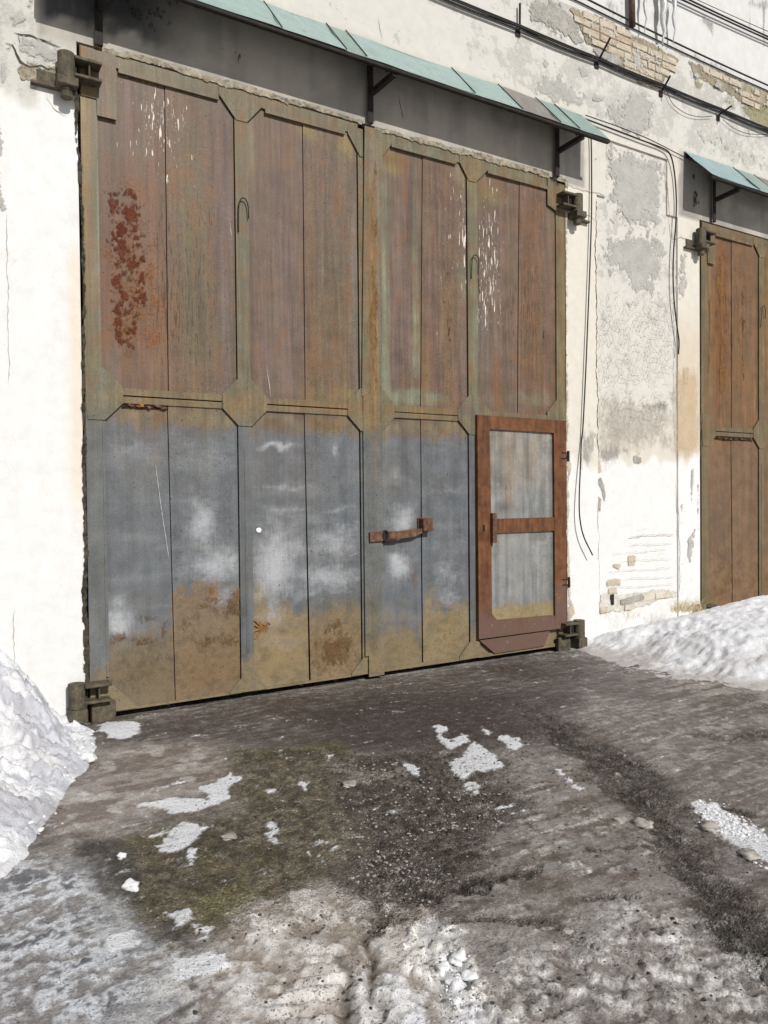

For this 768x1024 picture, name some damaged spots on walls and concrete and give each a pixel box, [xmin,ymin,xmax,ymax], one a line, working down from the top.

peeling [1,36,58,83]
spalling [527,0,768,114]
rust [107,188,148,353]
peeling [595,141,667,306]
water stain [584,369,697,462]
spalling [599,555,677,614]